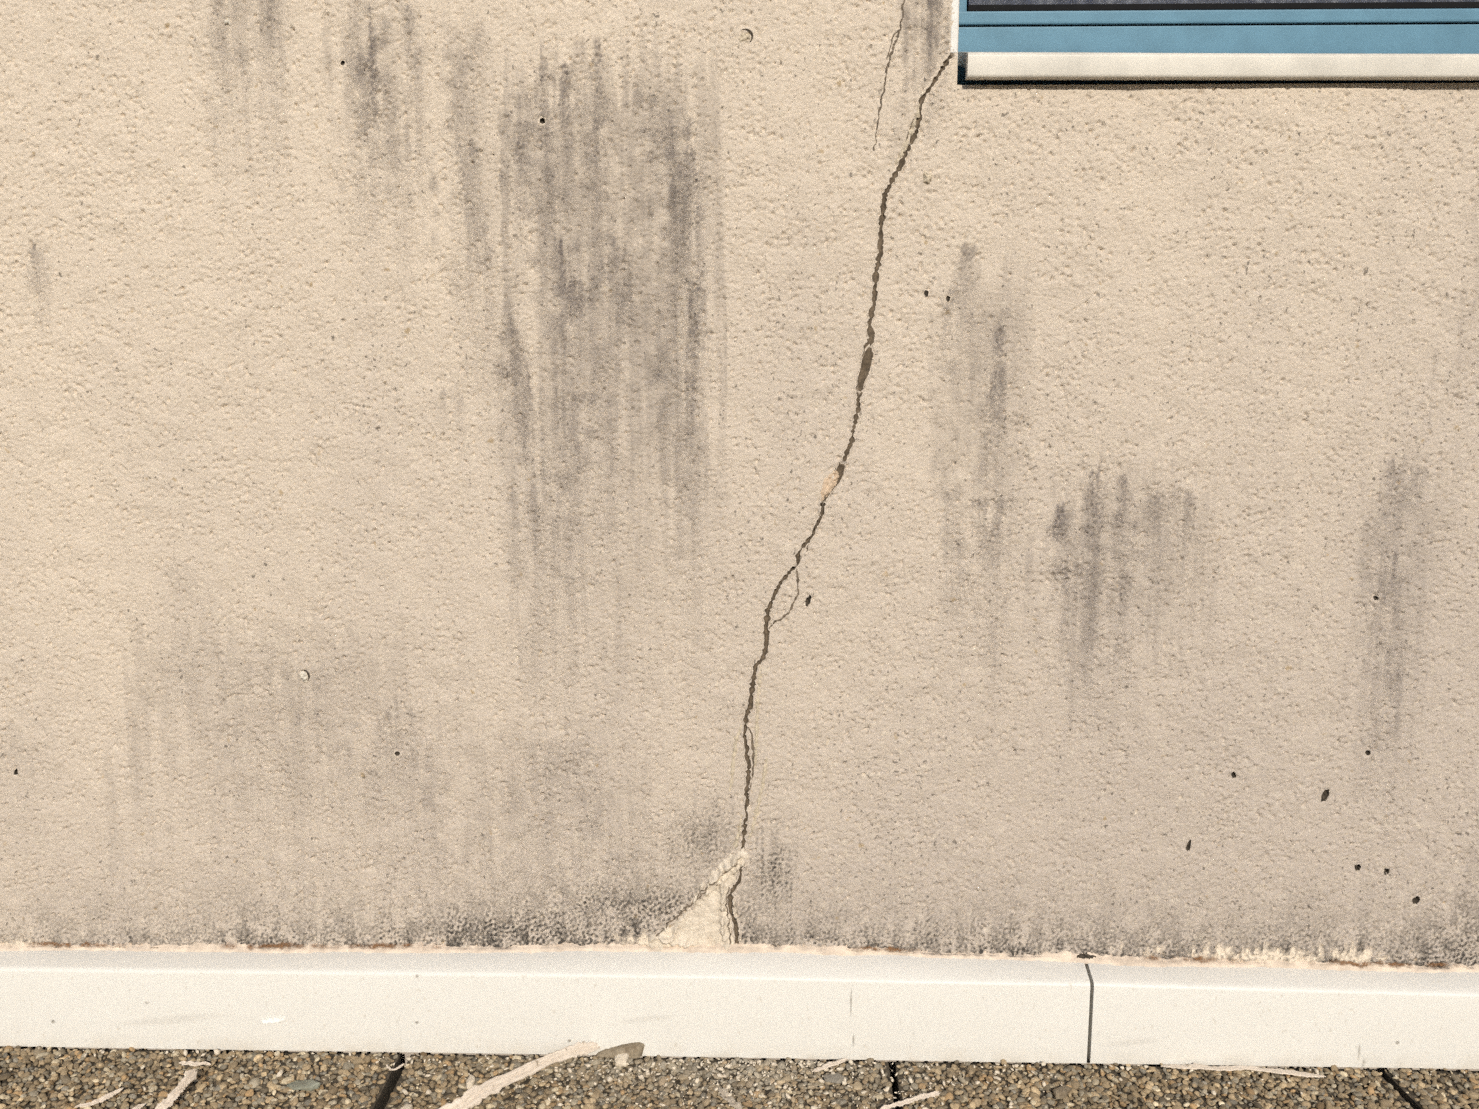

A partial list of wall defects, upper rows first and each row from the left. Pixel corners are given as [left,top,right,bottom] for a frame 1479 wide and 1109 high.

crack [656,0,954,944]
water stain [204,897,690,948]
water stain [740,915,1197,959]
water stain [1258,914,1479,968]